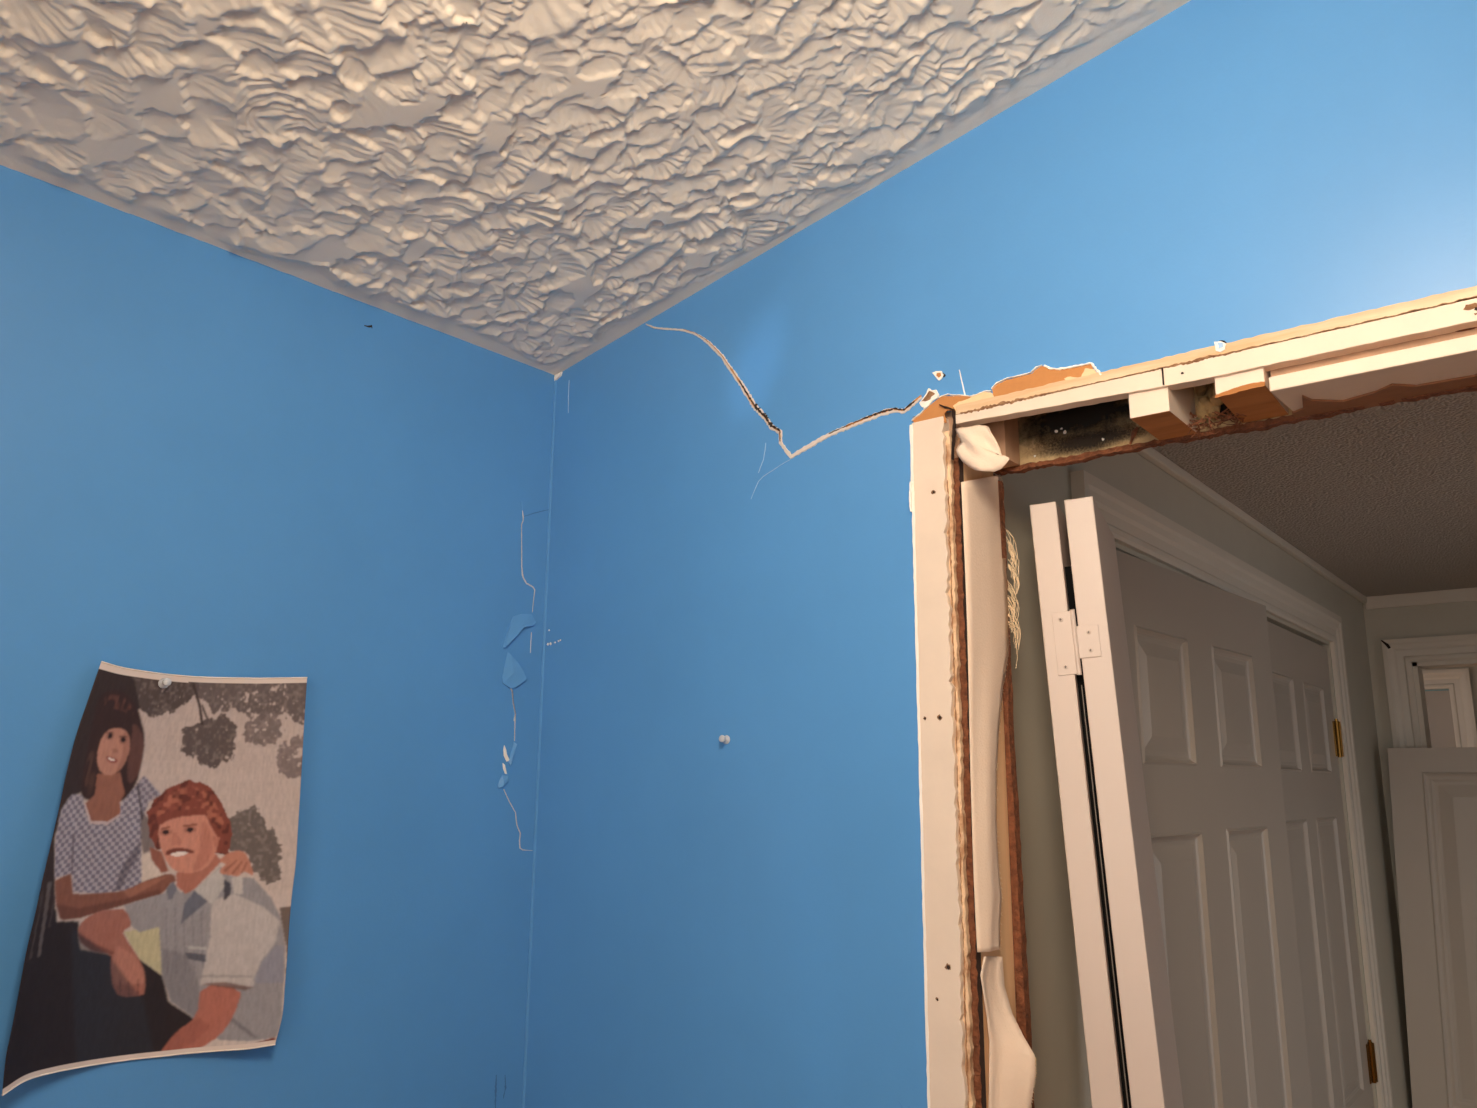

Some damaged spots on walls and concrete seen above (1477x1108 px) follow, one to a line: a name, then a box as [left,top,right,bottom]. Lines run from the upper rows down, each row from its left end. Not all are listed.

crack [646,324,922,498]
crack [497,501,549,851]
peeling [909,362,1101,1108]